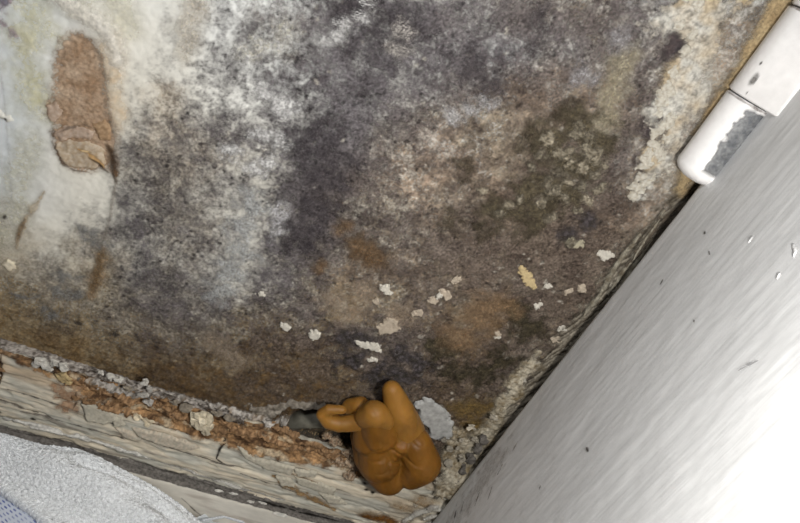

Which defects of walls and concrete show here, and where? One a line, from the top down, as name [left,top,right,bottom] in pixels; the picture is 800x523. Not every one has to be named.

spalling [45,32,119,177]
leakage [100,40,125,129]
peeling [308,329,321,341]
peeling [354,317,401,362]
leakage [51,383,82,413]
spalling [0,338,351,443]
peeling [0,412,284,505]
peeling [237,446,348,505]
leakage [271,407,353,451]
leakage [424,425,449,478]